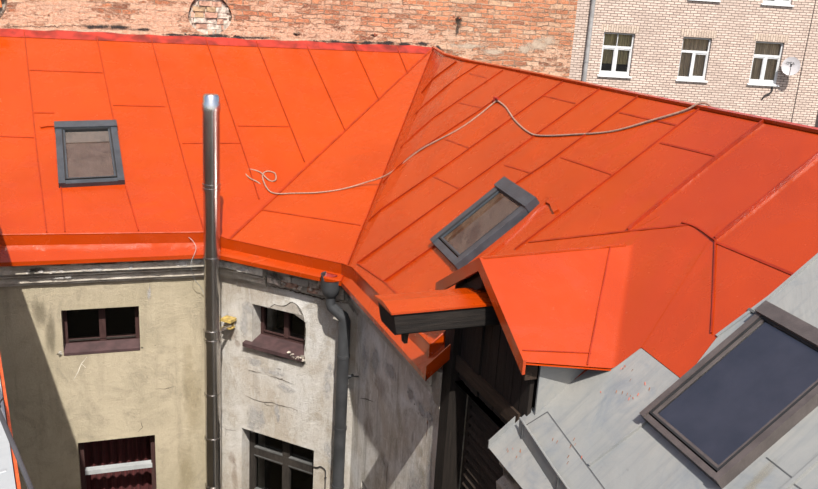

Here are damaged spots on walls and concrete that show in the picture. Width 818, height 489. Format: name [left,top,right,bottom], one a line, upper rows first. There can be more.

flaking render [266,270,321,364]